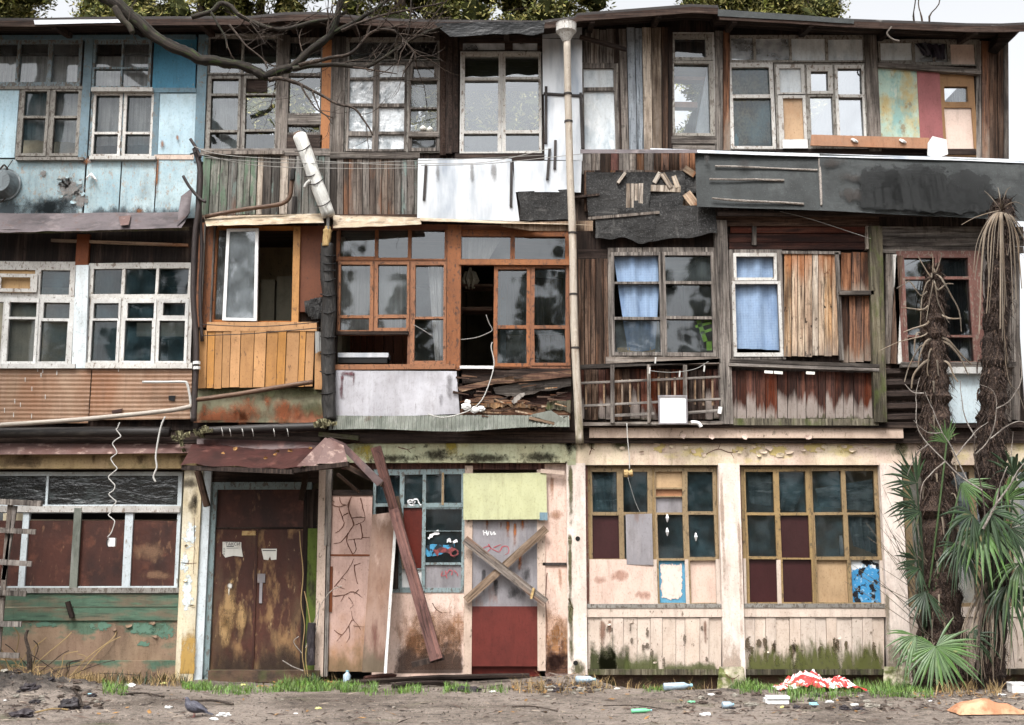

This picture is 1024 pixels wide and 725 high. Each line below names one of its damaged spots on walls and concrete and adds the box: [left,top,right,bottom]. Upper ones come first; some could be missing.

peeling [40,170,88,208]
corrosion [199,395,299,421]
flaking render [732,434,873,457]
peeling [180,521,197,615]
crack [332,496,370,643]
peeling [89,621,174,647]
corrosion [215,651,299,670]
leakage [395,642,463,673]